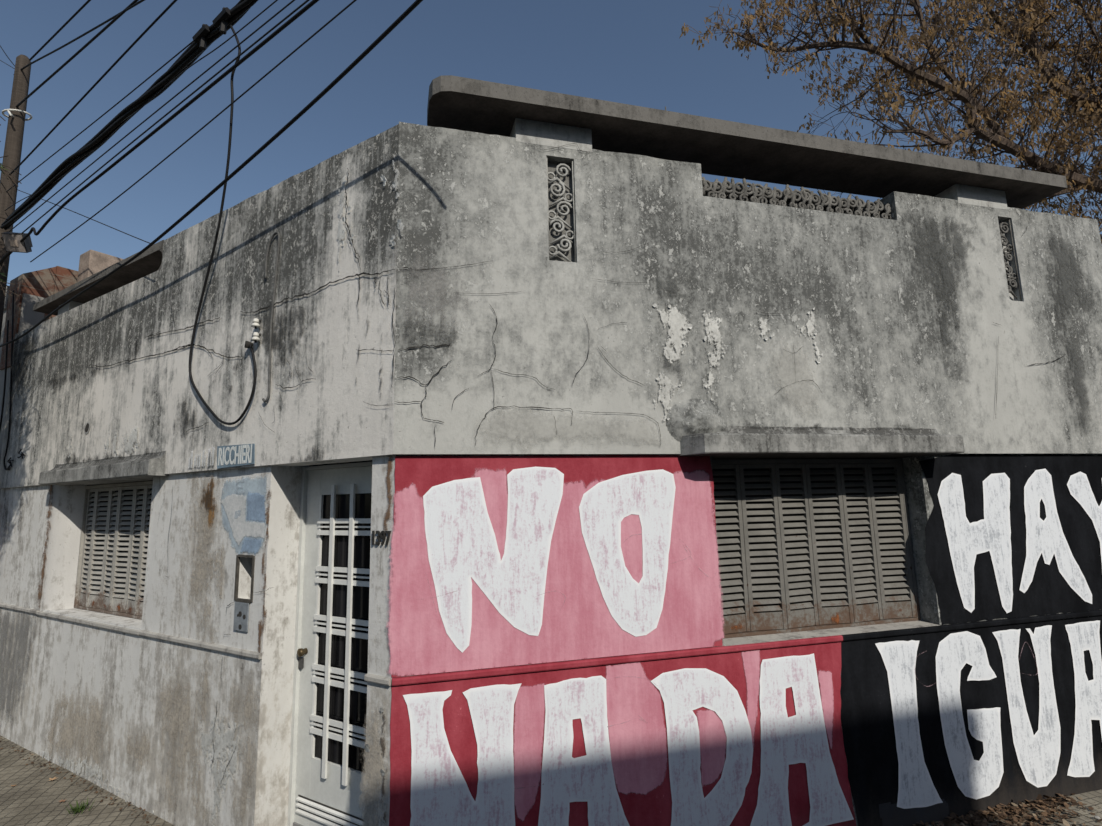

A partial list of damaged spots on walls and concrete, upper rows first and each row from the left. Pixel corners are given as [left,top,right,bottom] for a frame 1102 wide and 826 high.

leakage [174,401,195,437]
leakage [260,301,316,375]
crack [87,168,661,445]
peeling [653,303,725,422]
leakage [903,217,975,379]
leakage [1048,234,1095,428]
rust [200,478,215,524]
leakage [0,611,34,717]
leakage [127,661,207,825]